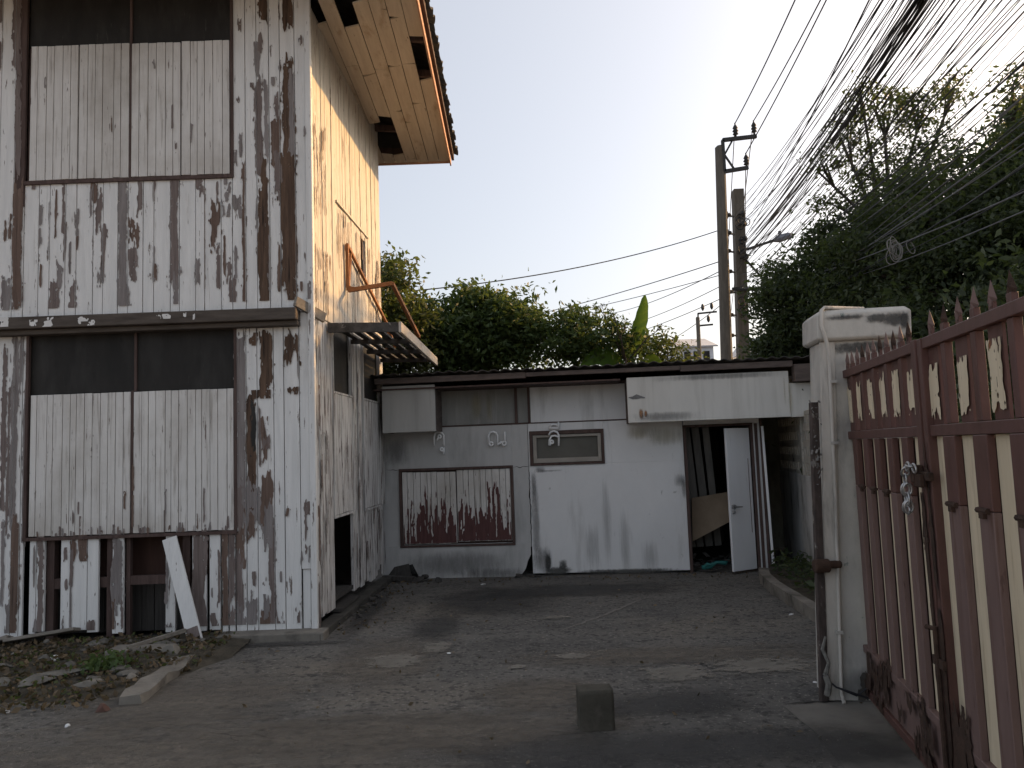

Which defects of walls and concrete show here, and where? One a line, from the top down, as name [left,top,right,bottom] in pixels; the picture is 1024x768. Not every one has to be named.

peeling [29,0,381,327]
peeling [0,0,149,633]
damp [831,313,908,328]
peeling [847,369,916,423]
peeling [929,362,941,419]
peeling [957,355,971,415]
peeling [986,336,1006,413]
peeling [164,328,330,626]